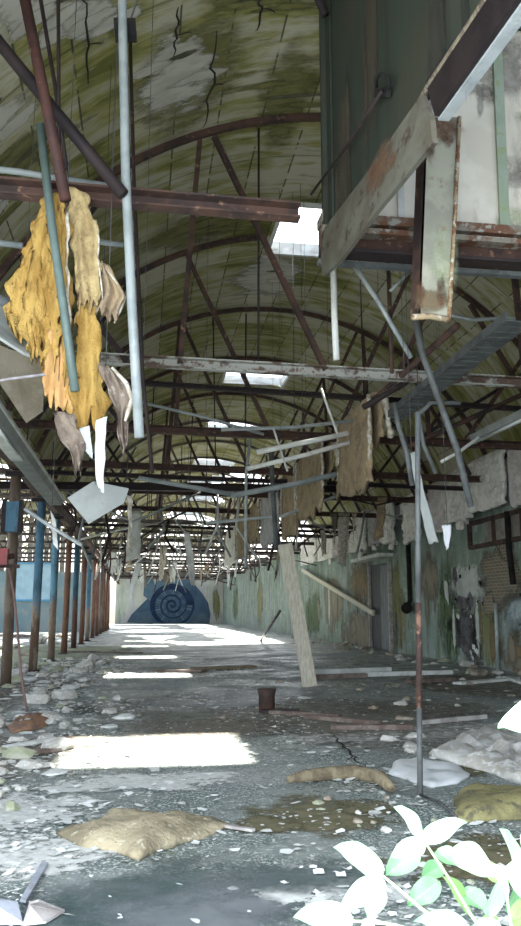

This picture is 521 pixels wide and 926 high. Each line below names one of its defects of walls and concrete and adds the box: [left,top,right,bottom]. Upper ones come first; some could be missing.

peeling [0,0,141,49]
crack [82,0,103,84]
peeling [133,33,229,113]
crack [173,7,192,57]
crack [203,31,224,128]
crack [255,0,276,31]
damp [306,579,369,647]
damp [421,551,438,627]
flaking render [444,544,521,666]
crack [331,732,366,767]